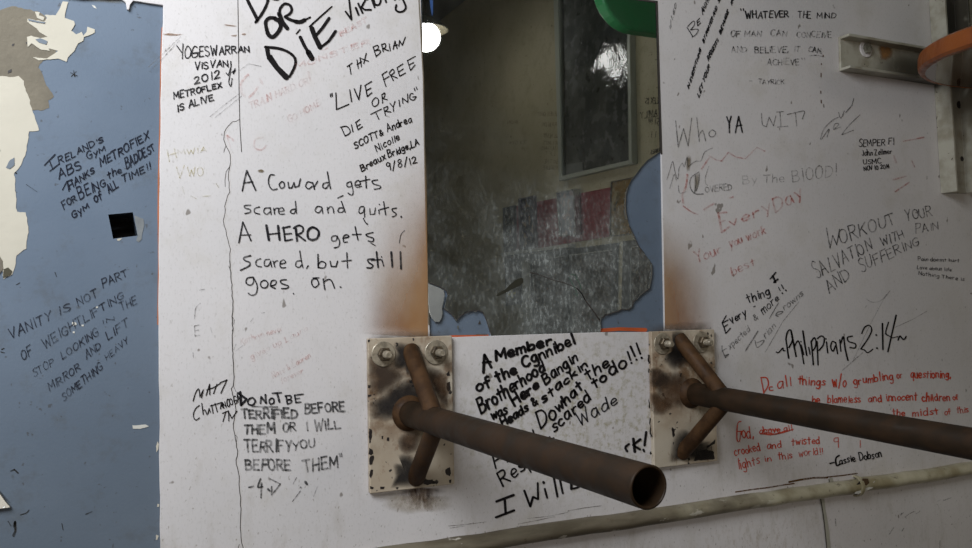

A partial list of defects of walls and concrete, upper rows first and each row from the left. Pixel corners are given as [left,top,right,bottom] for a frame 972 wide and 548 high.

rust [385,222,428,337]